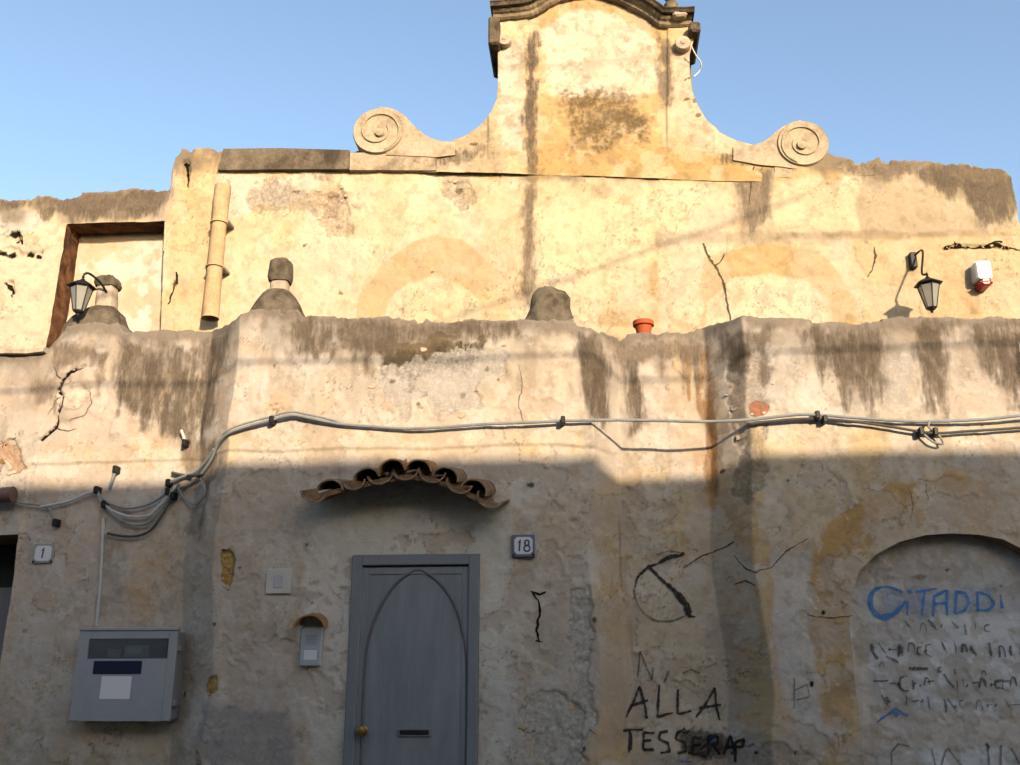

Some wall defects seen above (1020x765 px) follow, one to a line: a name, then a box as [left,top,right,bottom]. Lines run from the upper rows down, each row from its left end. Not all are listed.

damp [564,89,648,153]
damp [521,32,541,304]
crack [703,243,731,320]
crack [41,367,83,442]
damp [52,337,227,492]
damp [292,318,519,393]
damp [577,334,705,435]
damp [803,319,949,411]
spalling [0,438,27,476]
spalling [219,549,241,590]
crack [530,591,546,642]
peeling [517,690,586,765]